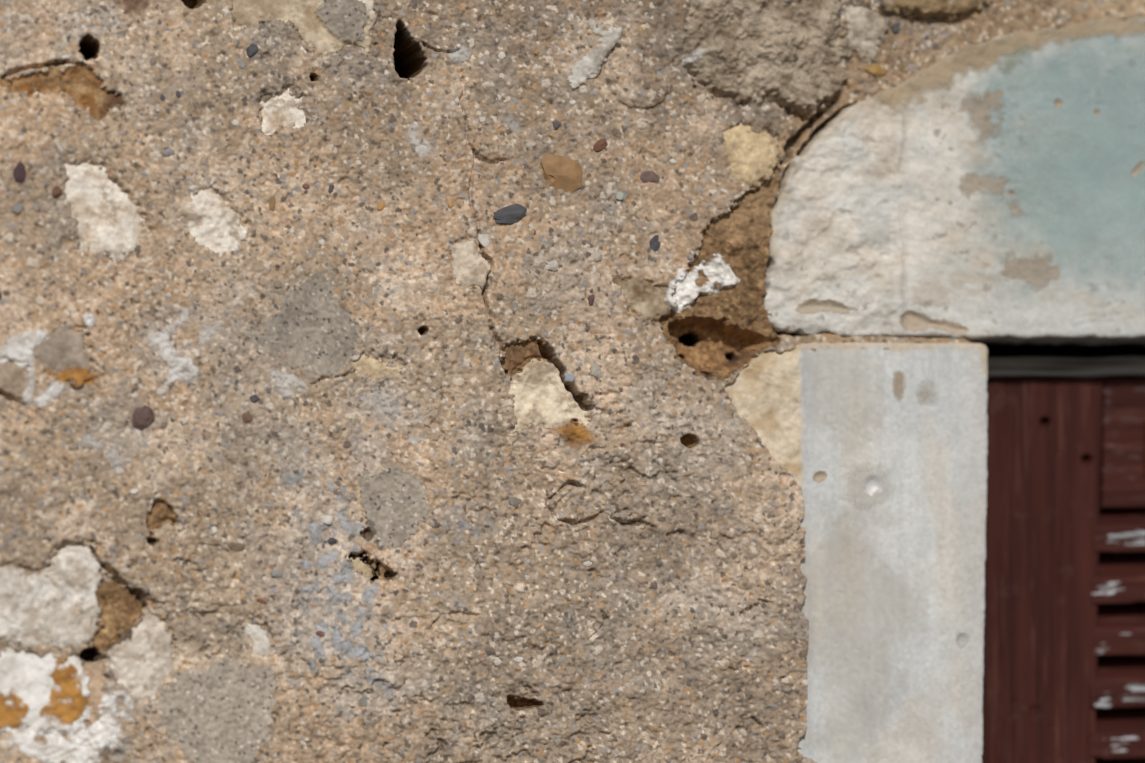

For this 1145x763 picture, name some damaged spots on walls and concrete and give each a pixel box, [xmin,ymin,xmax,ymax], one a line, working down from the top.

flaking render [0,60,126,121]
peeling [962,91,1002,138]
crack [474,154,504,163]
crack [481,278,489,303]
flaking render [613,123,781,381]
peeling [1003,254,1059,286]
spalling [899,310,969,335]
flaking render [0,312,96,408]
flaking render [0,544,173,736]